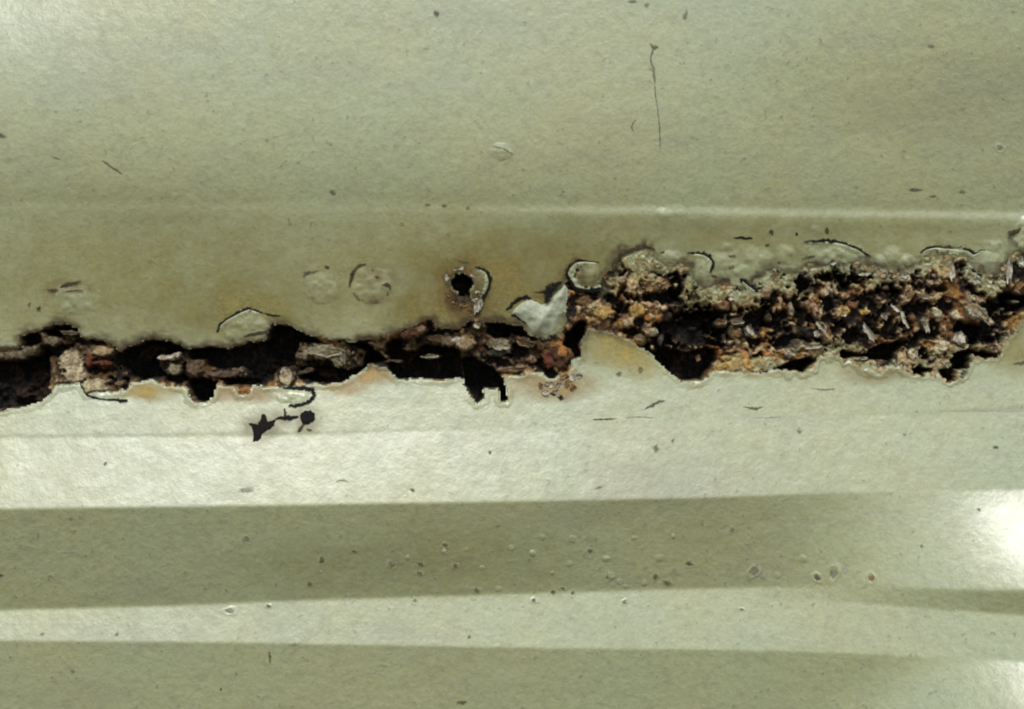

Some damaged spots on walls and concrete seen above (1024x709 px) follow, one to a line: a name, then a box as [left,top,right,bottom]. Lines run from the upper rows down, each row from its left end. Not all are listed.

spalling [0,329,63,410]
peeling [76,381,128,403]
spalling [124,322,528,408]
corrosion [99,240,1024,410]